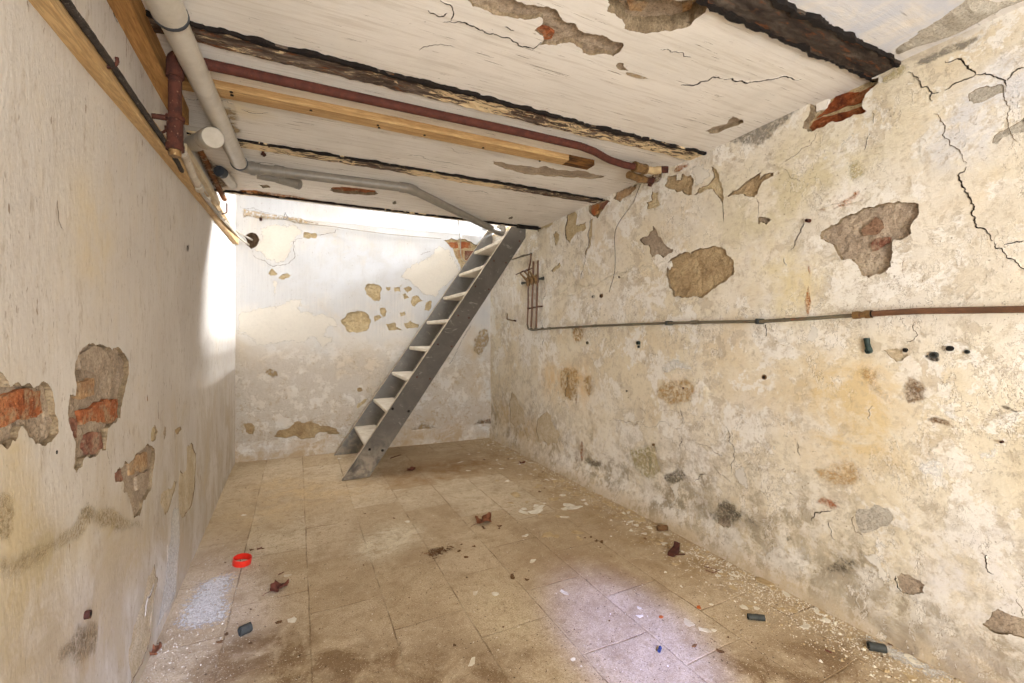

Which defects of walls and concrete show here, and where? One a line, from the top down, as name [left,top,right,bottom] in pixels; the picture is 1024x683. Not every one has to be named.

crack [420,0,541,50]
flaking render [472,0,626,69]
crack [683,76,801,86]
flaking render [808,82,878,131]
crack [908,57,1024,269]
flaking render [245,233,259,249]
flaking render [641,228,735,298]
flaking render [823,202,919,277]
flaking render [341,284,432,333]
flaking render [0,385,52,445]
flaking render [68,345,124,468]
flaking render [984,609,1024,637]